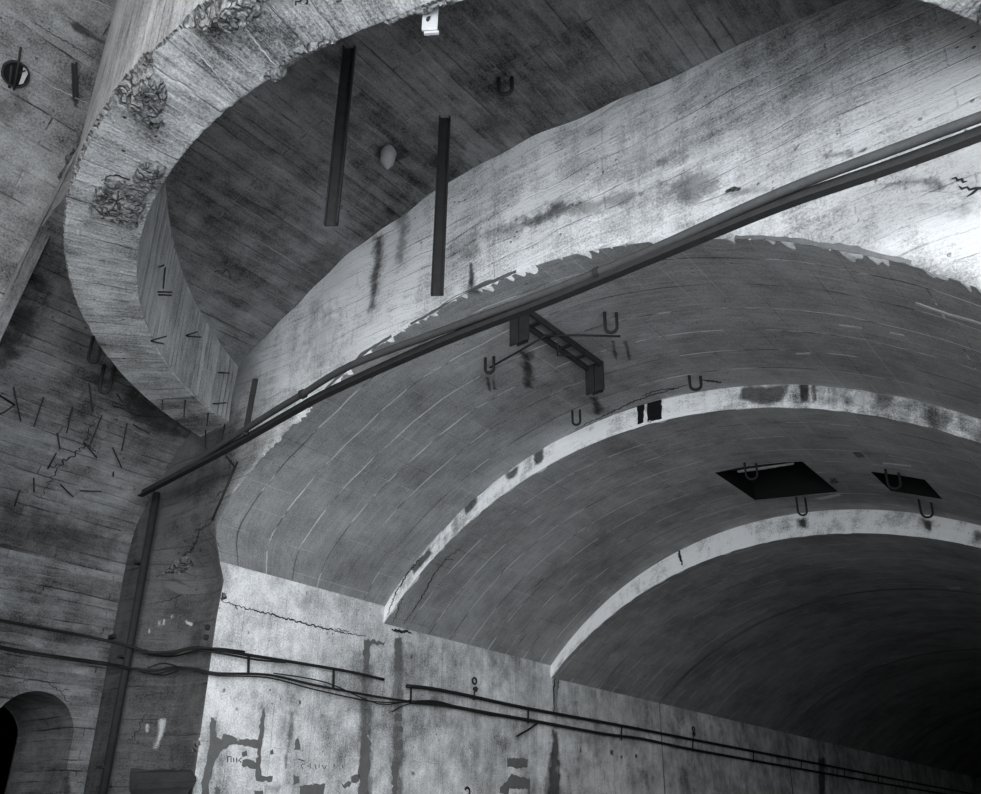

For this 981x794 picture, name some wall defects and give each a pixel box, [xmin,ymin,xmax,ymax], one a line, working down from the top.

spalling [126,73,168,132]
spalling [88,162,167,228]
crack [952,177,981,197]
water stain [370,237,383,308]
crack [41,412,100,498]
crack [157,491,223,577]
crack [220,598,363,636]
crack [388,548,461,634]
peeling [362,637,402,669]
peeling [191,709,274,794]
peeling [293,774,325,794]
peeling [341,715,372,794]